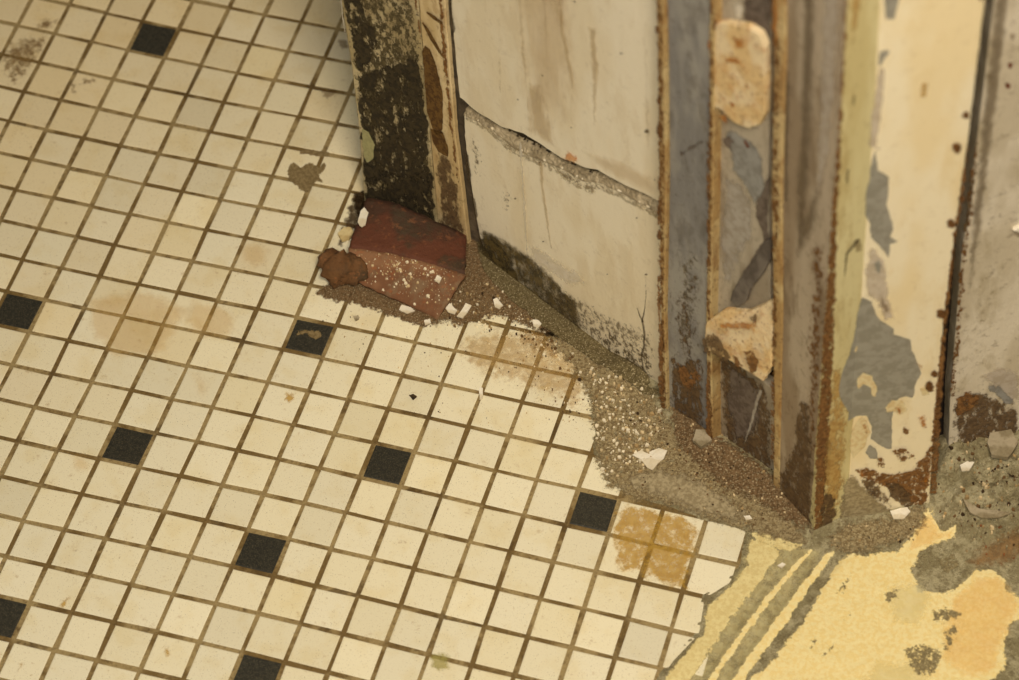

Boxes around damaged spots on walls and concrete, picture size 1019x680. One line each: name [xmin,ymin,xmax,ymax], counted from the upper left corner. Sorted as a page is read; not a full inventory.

peeling [358,208,368,227]
mould [344,0,435,221]
peeling [445,303,471,319]
crack [464,106,660,215]
leakage [478,143,653,377]
rust [655,0,848,530]
peeling [666,50,1019,680]
rust [925,142,1018,494]
leakage [614,507,695,586]